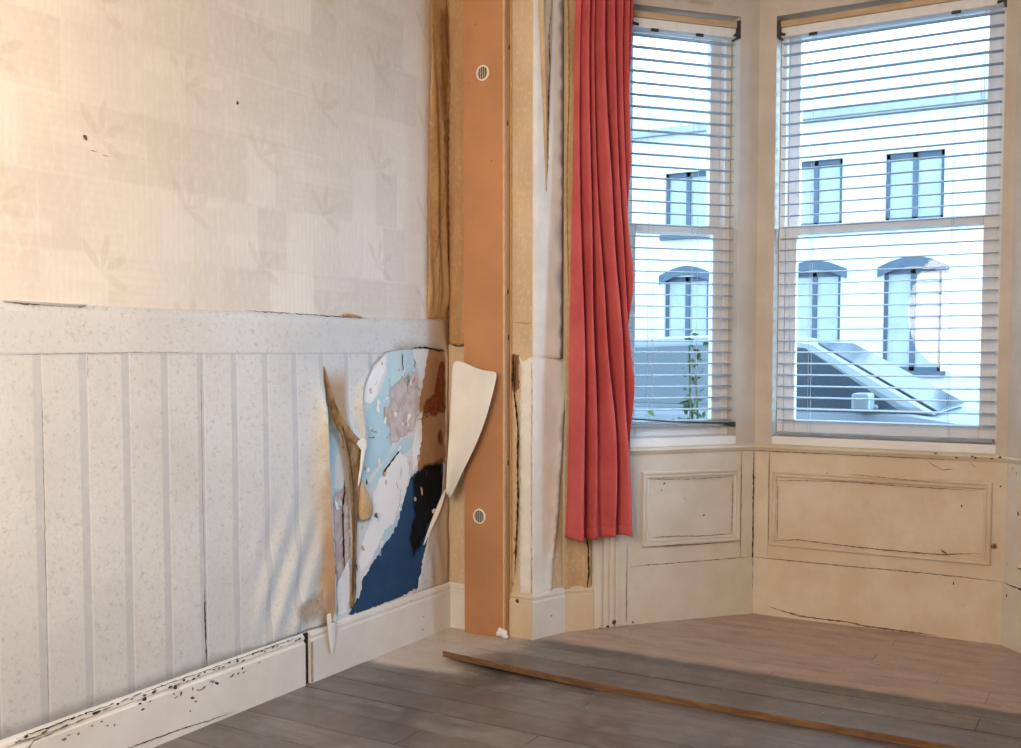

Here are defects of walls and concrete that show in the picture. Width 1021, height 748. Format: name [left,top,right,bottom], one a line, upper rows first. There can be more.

flaking render [538,0,551,149]
flaking render [324,349,446,620]
crack [625,451,1021,617]
crack [768,606,938,636]
crack [17,725,69,748]
crack [130,712,232,748]